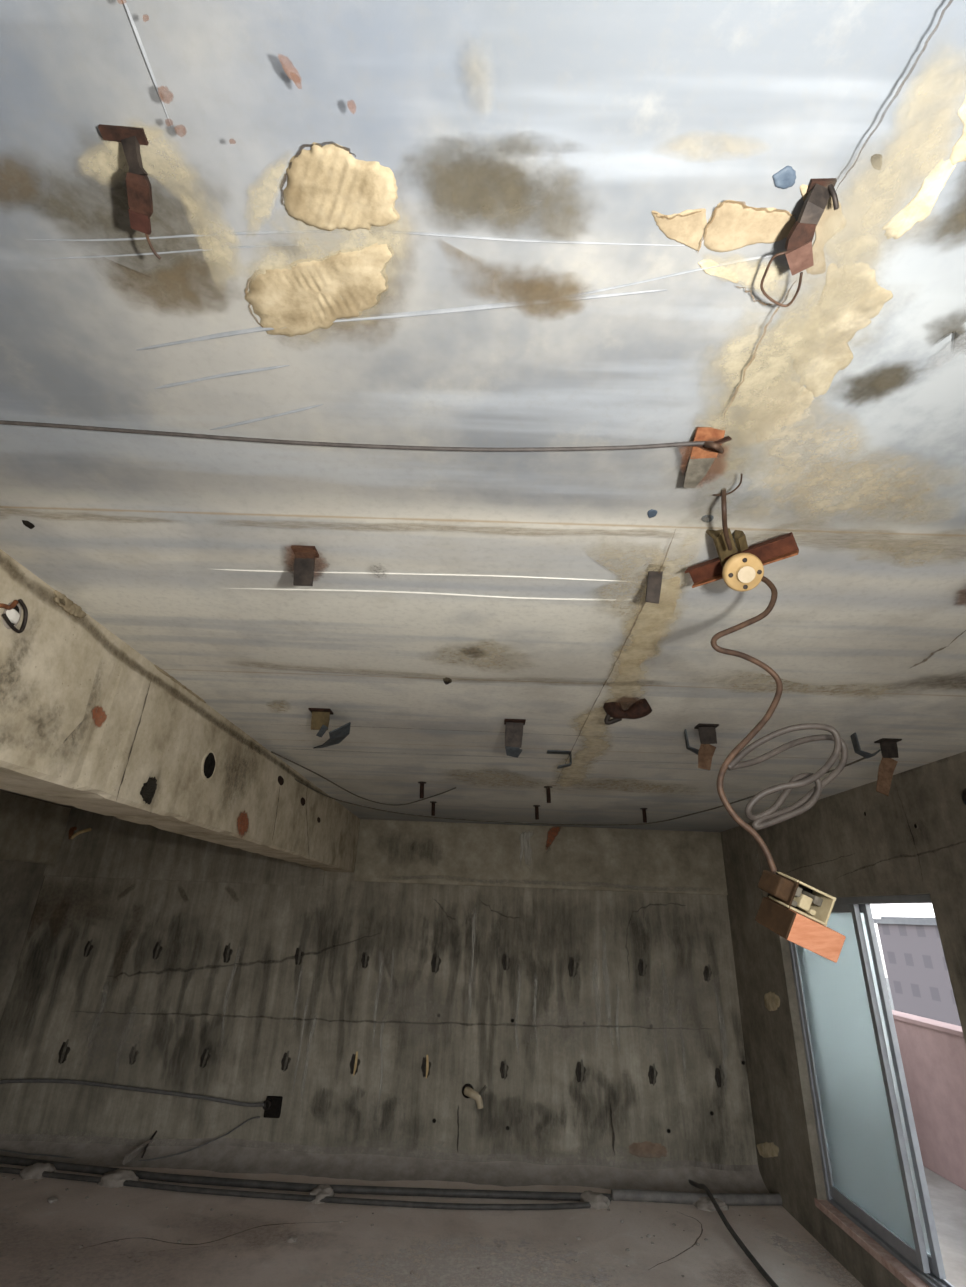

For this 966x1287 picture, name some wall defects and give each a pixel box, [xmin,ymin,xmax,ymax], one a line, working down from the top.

crack [836,0,953,191]
water stain [0,164,208,307]
peeling [88,139,235,261]
spalling [244,142,400,337]
water stain [436,166,578,235]
water stain [491,271,573,313]
peeling [651,200,796,306]
peeling [710,95,966,472]
corrosion [680,440,728,484]